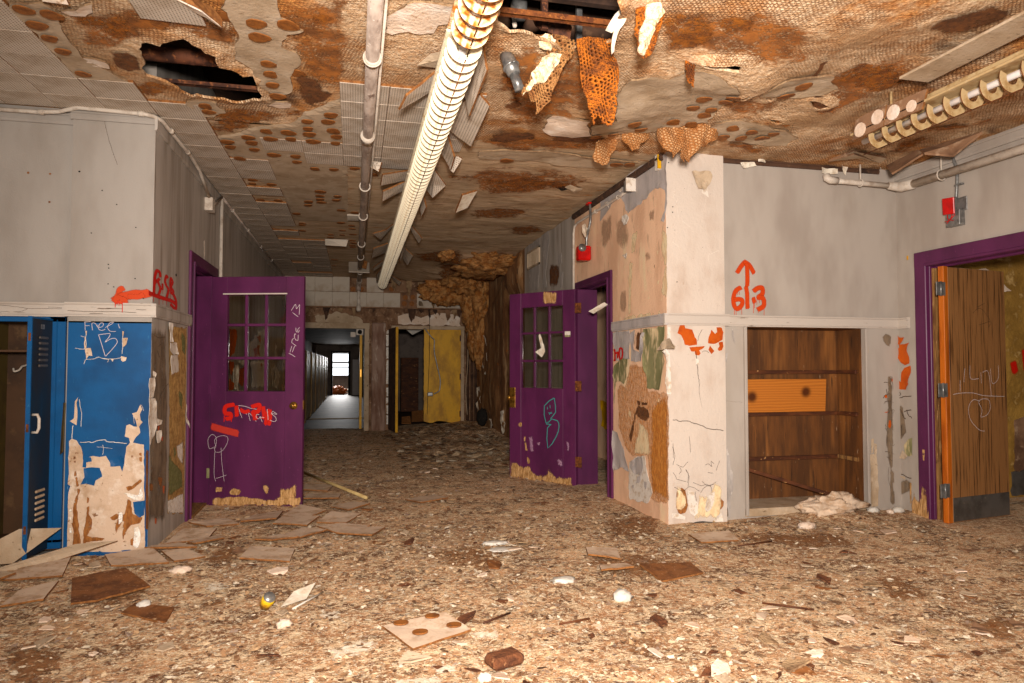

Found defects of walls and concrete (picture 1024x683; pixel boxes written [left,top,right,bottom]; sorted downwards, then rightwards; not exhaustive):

peeling [60,322,190,556]
peeling [600,330,652,503]
peeling [657,325,735,394]
crack [673,330,723,500]
spalling [672,449,733,522]
peeling [892,337,911,390]